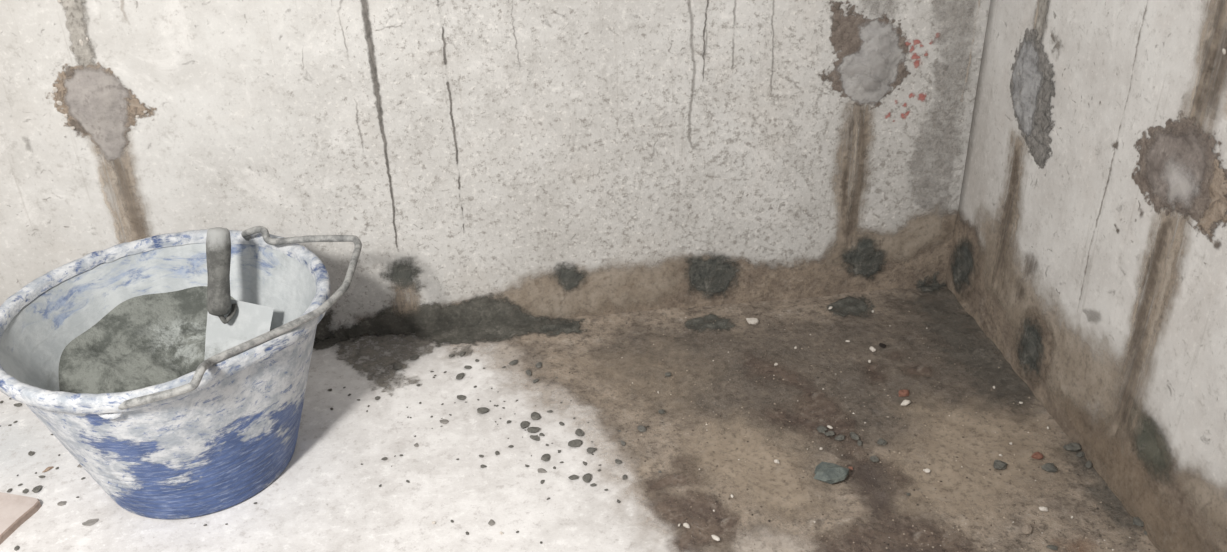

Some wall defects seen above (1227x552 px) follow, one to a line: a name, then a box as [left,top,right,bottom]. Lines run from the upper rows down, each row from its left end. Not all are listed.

spalling [47,62,156,162]
damp [95,144,147,244]
crack [361,0,398,247]
crack [437,0,464,230]
crack [701,0,709,79]
spalling [821,1,910,109]
spalling [1010,28,1060,168]
spalling [1131,110,1227,248]
damp [1183,0,1227,135]
damp [313,104,1227,552]